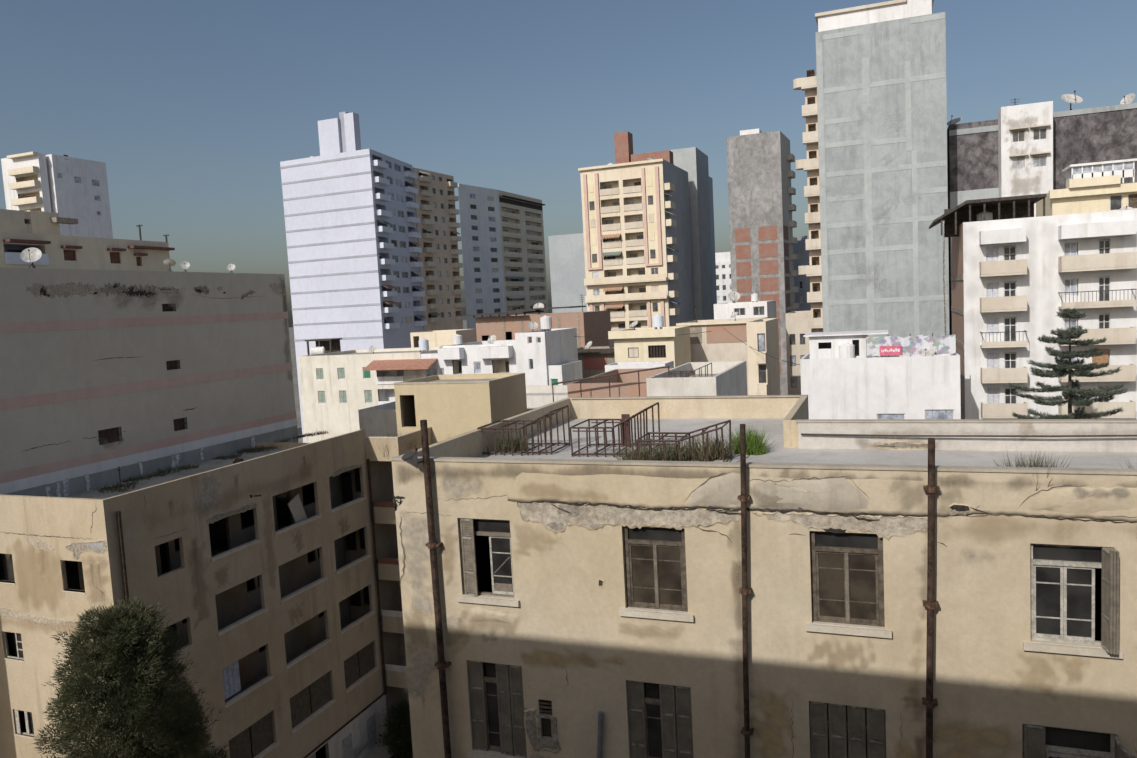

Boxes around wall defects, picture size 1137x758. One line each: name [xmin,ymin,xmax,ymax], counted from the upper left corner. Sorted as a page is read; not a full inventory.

spalling [26,282,226,299]
spalling [873,440,938,450]
flaking render [506,464,1137,541]
crack [399,473,1134,588]
spalling [27,536,108,560]